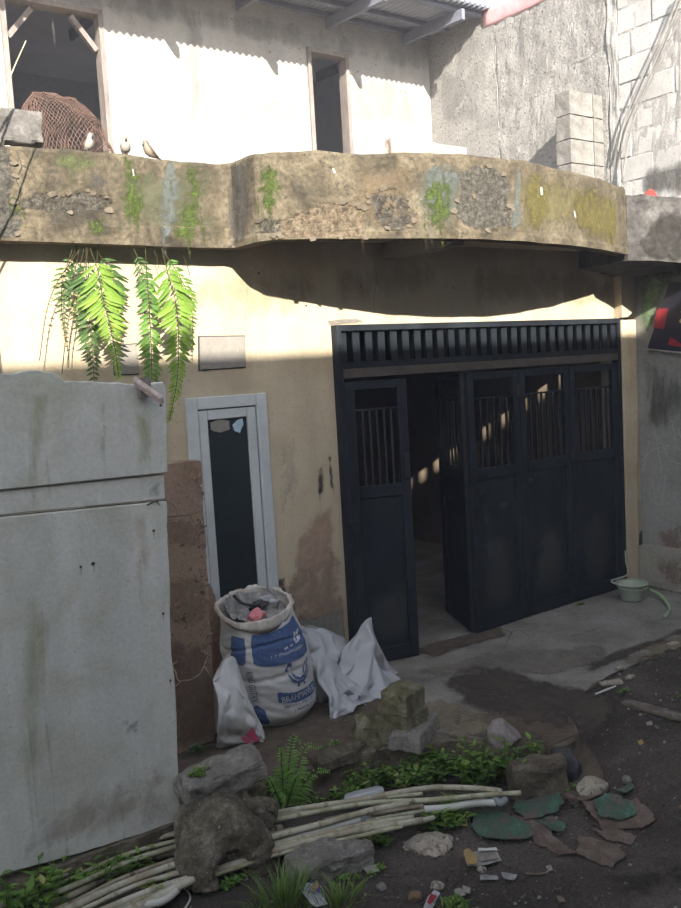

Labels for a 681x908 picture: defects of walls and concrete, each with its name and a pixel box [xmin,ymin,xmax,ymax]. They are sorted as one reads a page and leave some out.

spalling [0,138,115,238]
spalling [255,185,418,242]
spalling [450,163,513,233]
leakage [643,213,681,277]
leakage [646,163,681,190]
peeling [288,511,345,637]